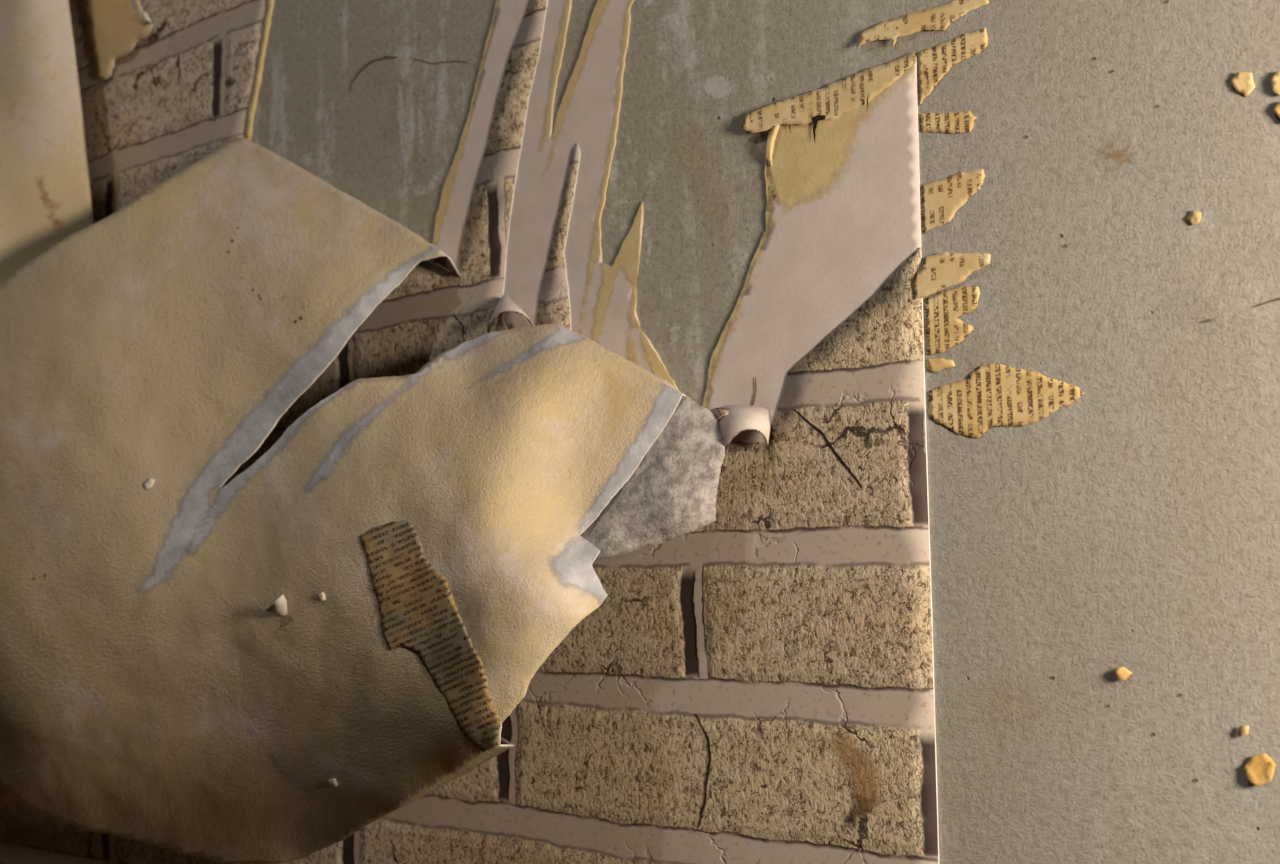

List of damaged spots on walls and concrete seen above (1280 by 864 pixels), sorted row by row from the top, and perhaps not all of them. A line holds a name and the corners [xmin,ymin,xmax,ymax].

crack [349,56,468,92]
leakage [702,76,735,100]
leakage [396,73,447,196]
crack [794,410,862,487]